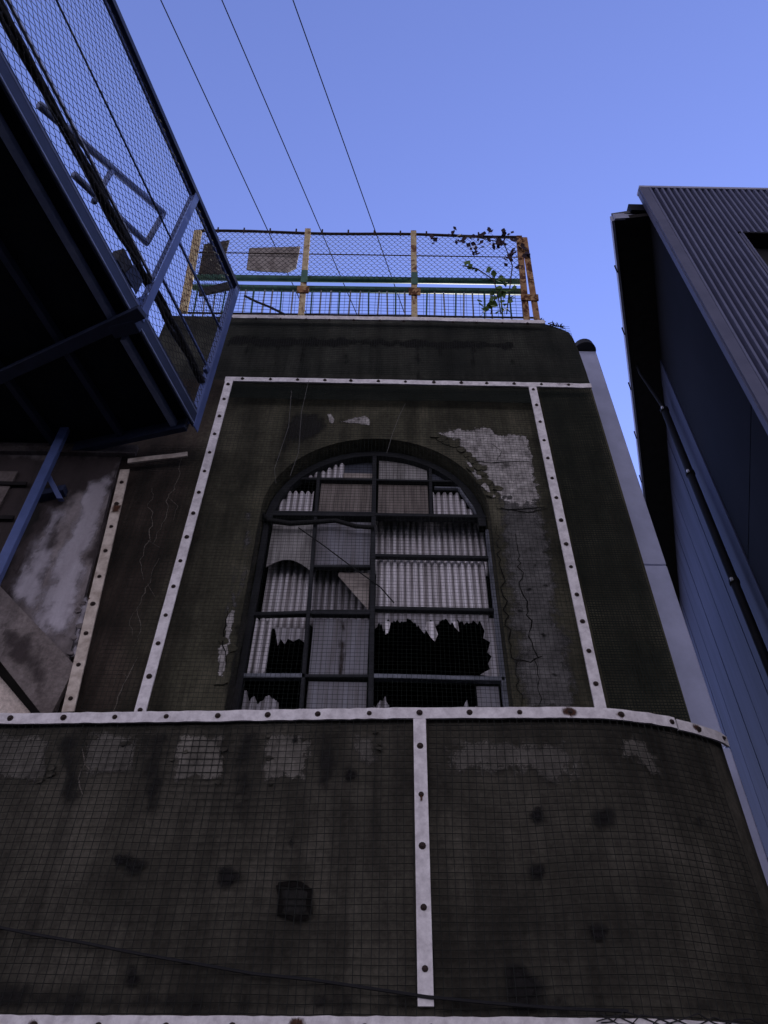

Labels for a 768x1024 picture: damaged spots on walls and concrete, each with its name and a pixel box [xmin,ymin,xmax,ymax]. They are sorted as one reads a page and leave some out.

spalling [327,414,370,425]
damp [0,455,122,631]
flaking render [430,427,578,707]
flaking render [214,594,238,686]
spalling [437,739,587,784]
spalling [621,737,660,774]